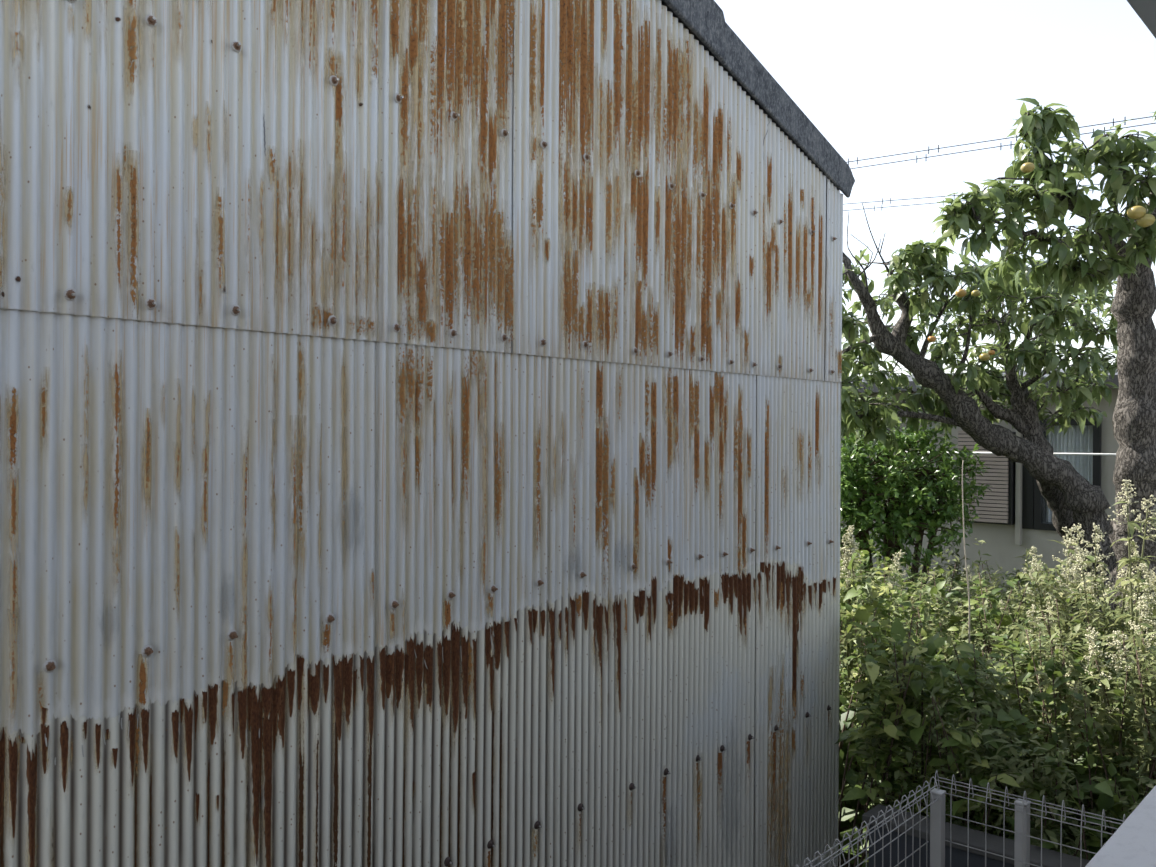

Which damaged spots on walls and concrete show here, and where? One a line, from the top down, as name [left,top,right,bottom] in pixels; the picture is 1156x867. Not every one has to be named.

rust [114,145,139,313]
rust [247,0,381,334]
rust [352,0,515,616]
rust [529,0,550,260]
rust [559,0,832,628]
rust [8,387,19,710]
rust [291,340,305,564]
rust [135,754,152,867]
rust [207,732,226,867]
rust [298,722,319,867]
rust [440,710,461,867]
rust [487,703,502,867]